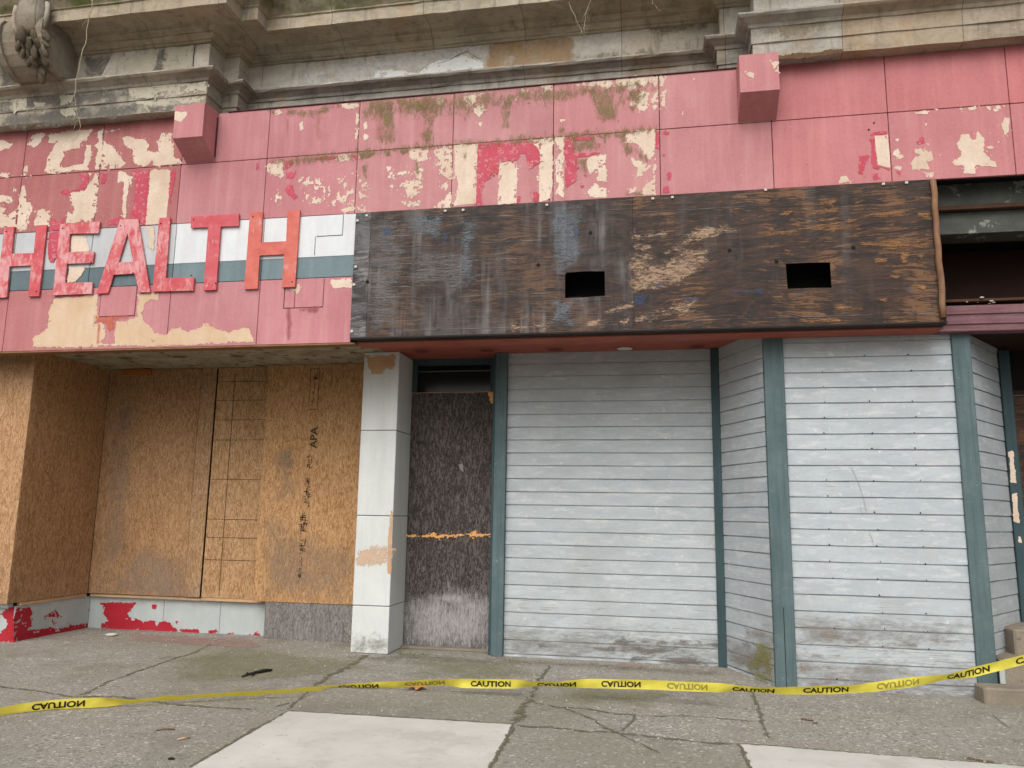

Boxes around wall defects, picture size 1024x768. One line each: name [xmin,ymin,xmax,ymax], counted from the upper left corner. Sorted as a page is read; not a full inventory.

peeling [0,128,182,262]
leakage [279,80,656,176]
peeling [387,135,609,208]
peeling [623,129,671,195]
peeling [839,103,1012,184]
peeling [67,266,85,283]
peeling [587,225,735,326]
peeling [32,293,254,348]
peeling [364,354,396,374]
peeling [1008,451,1020,523]
peeling [356,511,393,574]
peeling [0,600,234,642]